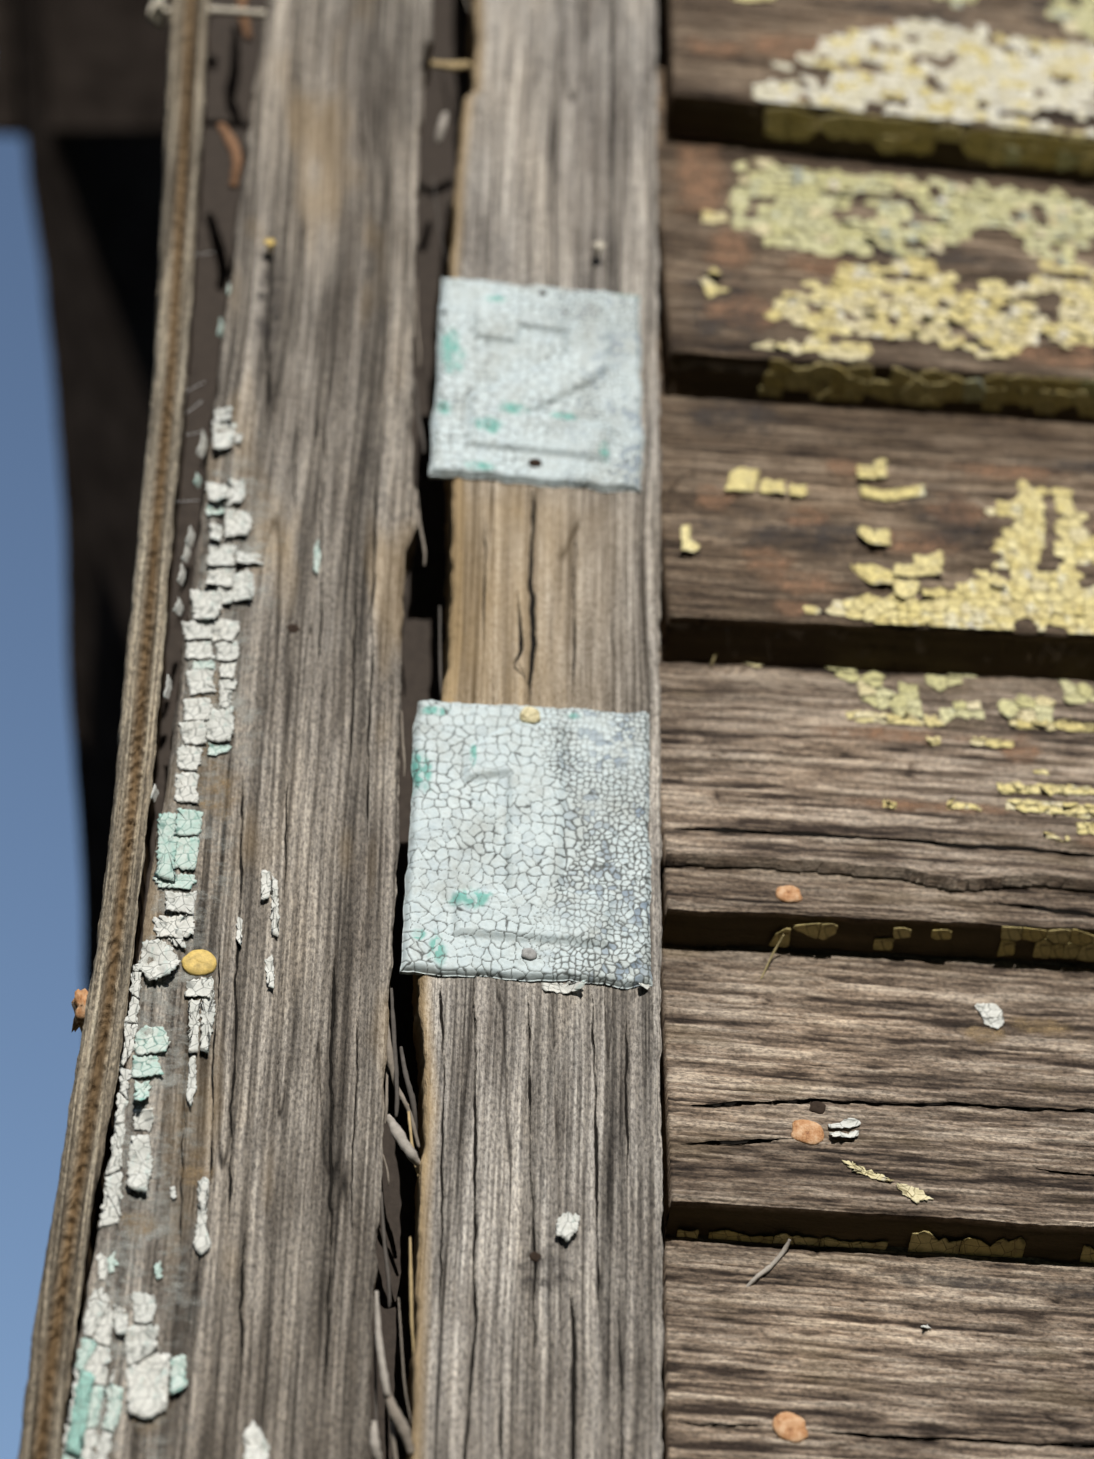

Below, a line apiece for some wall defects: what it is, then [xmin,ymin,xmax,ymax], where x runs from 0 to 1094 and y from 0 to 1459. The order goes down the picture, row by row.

peeling [753,0,1094,174]
peeling [700,159,1094,417]
peeling [724,467,809,496]
peeling [856,459,926,502]
peeling [680,524,700,553]
peeling [803,480,1094,635]
peeling [826,666,1094,748]
peeling [996,769,1094,842]
peeling [62,406,264,1459]
peeling [769,923,838,947]
peeling [997,926,1094,962]
peeling [908,1231,1026,1258]